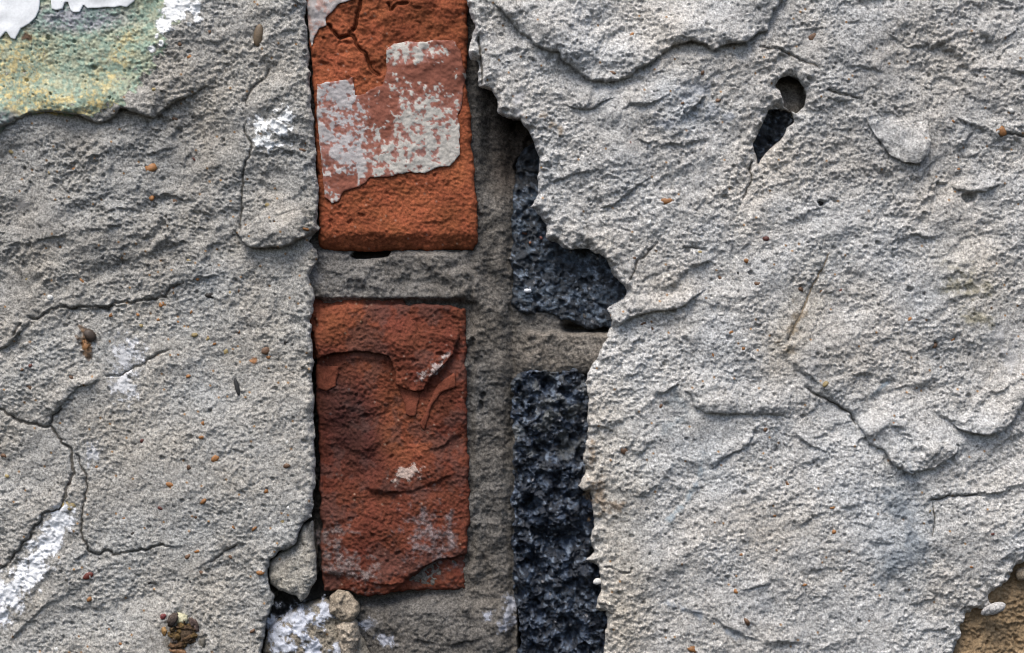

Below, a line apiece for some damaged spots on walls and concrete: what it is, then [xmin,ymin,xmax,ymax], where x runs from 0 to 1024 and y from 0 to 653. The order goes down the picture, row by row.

peeling [0,0,135,39]
peeling [307,0,350,46]
spalling [0,56,216,128]
peeling [316,40,466,203]
spalling [596,162,650,208]
crack [13,283,183,335]
crack [119,350,168,376]
spalling [310,299,459,430]
crack [807,388,856,425]
crack [0,408,172,569]
crack [929,494,982,535]